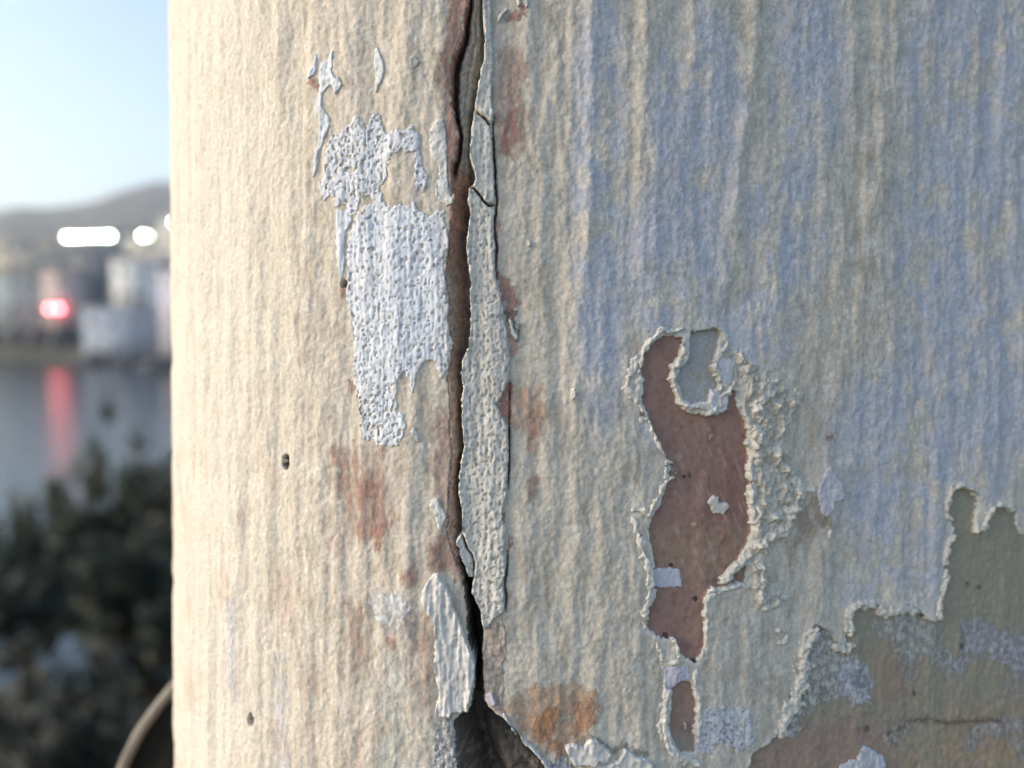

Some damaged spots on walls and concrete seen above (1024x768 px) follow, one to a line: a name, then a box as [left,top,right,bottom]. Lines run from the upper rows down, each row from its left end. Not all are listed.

crack [445,0,509,719]
peeling [307,0,653,768]
crack [505,388,513,486]
peeling [621,326,757,767]
peeling [817,466,845,539]
peeling [749,482,1024,768]